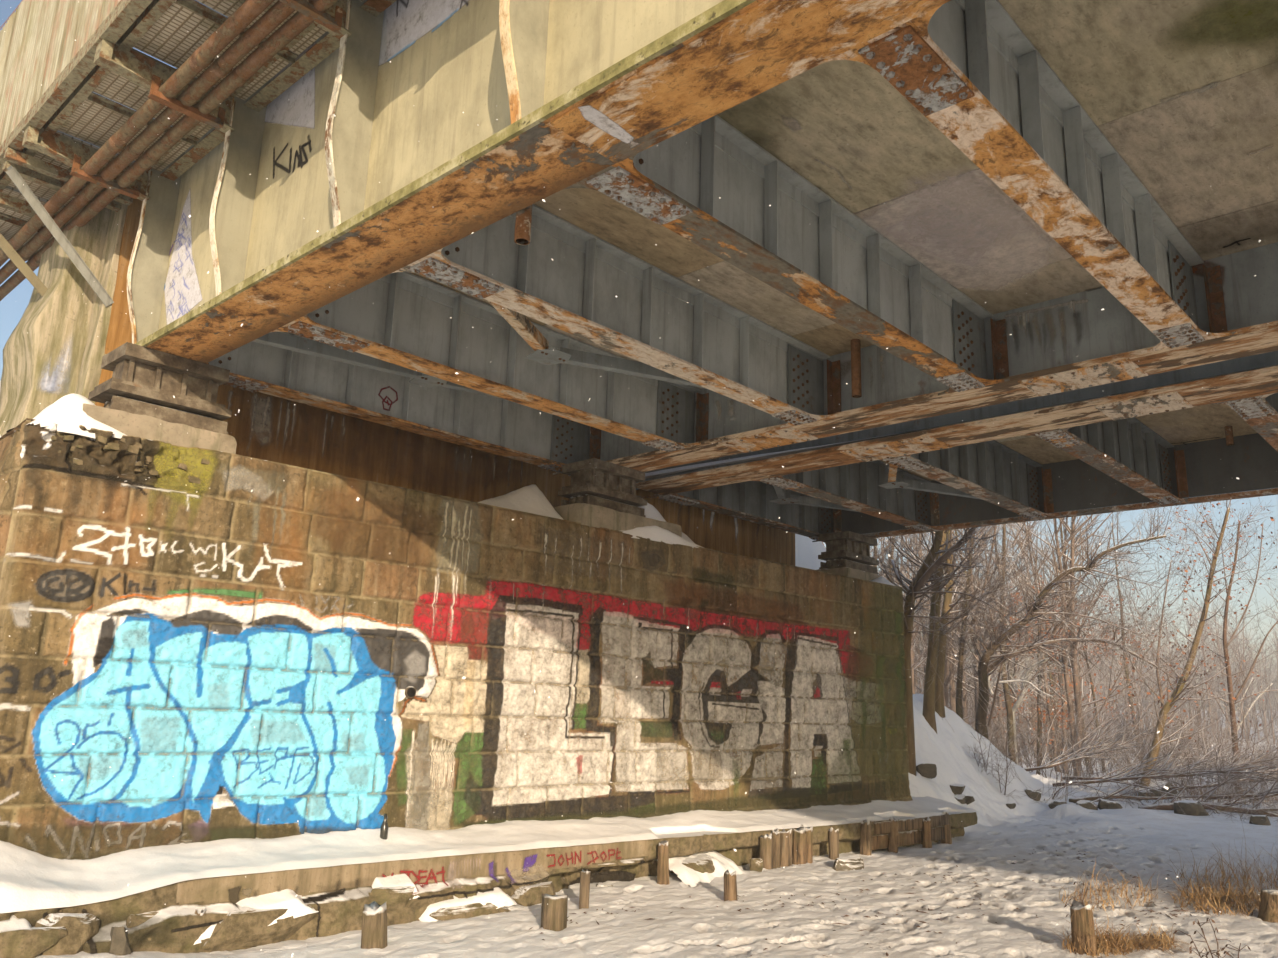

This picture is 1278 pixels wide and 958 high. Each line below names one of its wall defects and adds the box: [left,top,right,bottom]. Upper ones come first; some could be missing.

spalling [40,431,163,478]
spalling [177,459,210,484]
water stain [432,499,482,619]
water stain [569,538,630,589]